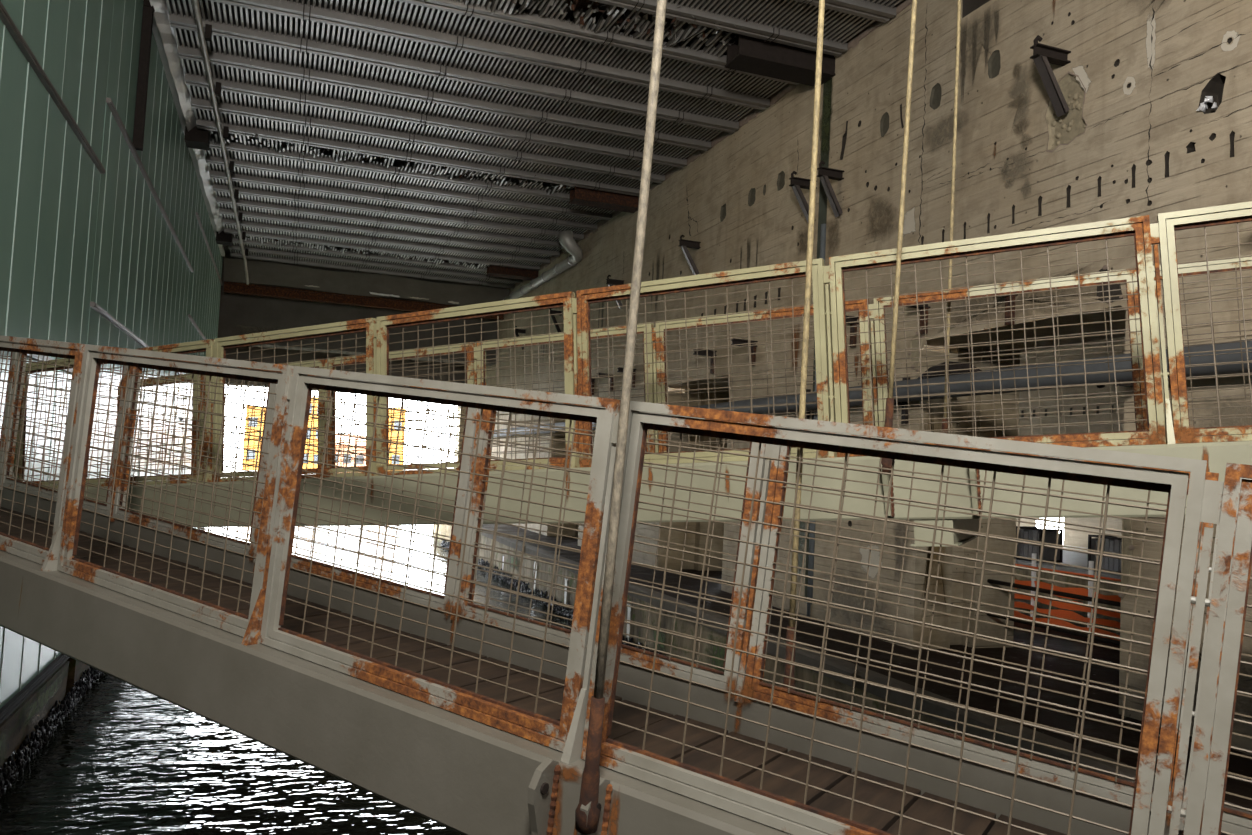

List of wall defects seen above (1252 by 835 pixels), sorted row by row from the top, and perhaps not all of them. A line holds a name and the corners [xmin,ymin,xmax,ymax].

leakage [961,14,999,93]
leakage [1002,66,1029,196]
spalling [1045,71,1087,152]